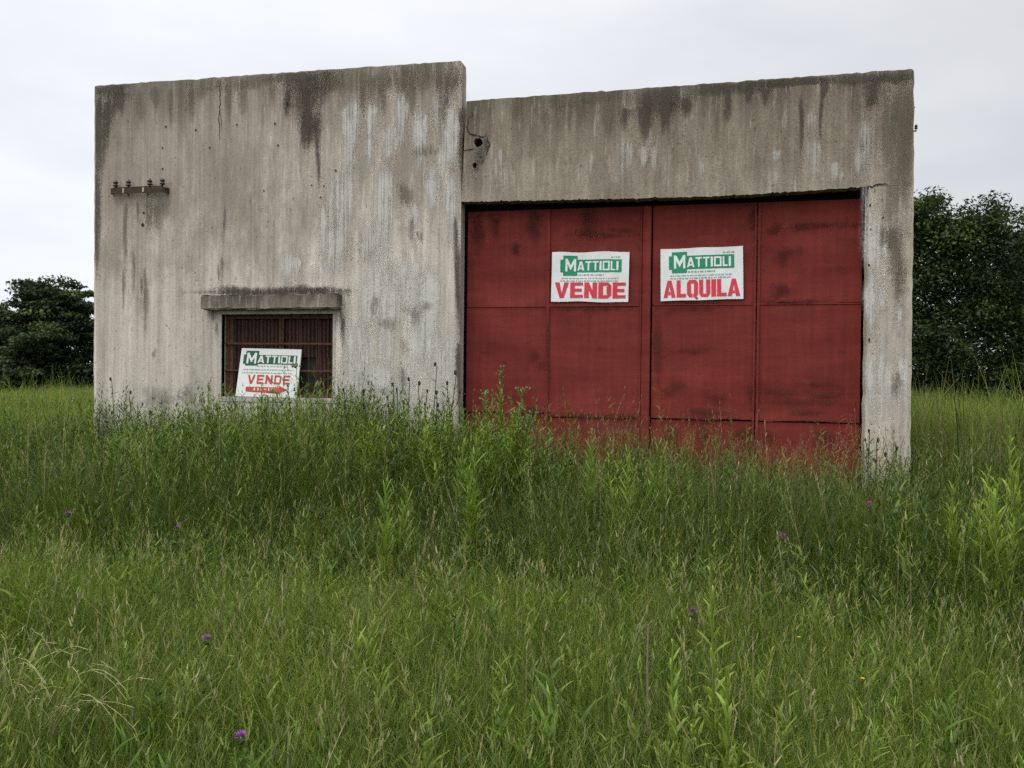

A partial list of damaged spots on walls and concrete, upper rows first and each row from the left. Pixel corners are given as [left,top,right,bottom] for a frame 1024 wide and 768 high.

leakage [95,85,172,266]
leakage [210,67,465,323]
leakage [604,89,691,171]
leakage [799,80,828,173]
leakage [855,123,874,175]
leakage [840,72,909,106]
leakage [900,94,912,155]
leakage [881,229,903,290]